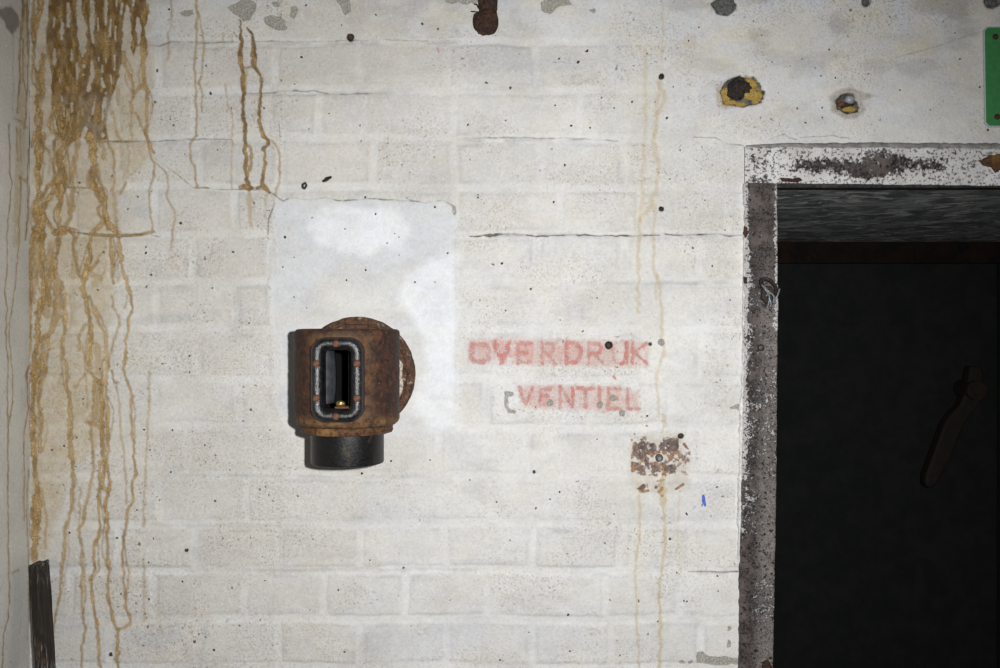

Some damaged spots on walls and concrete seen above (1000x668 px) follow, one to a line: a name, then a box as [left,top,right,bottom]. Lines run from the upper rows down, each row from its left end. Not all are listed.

spalling [717,75,765,108]
spalling [821,89,870,118]
corrosion [978,154,1000,173]
corrosion [631,425,690,497]